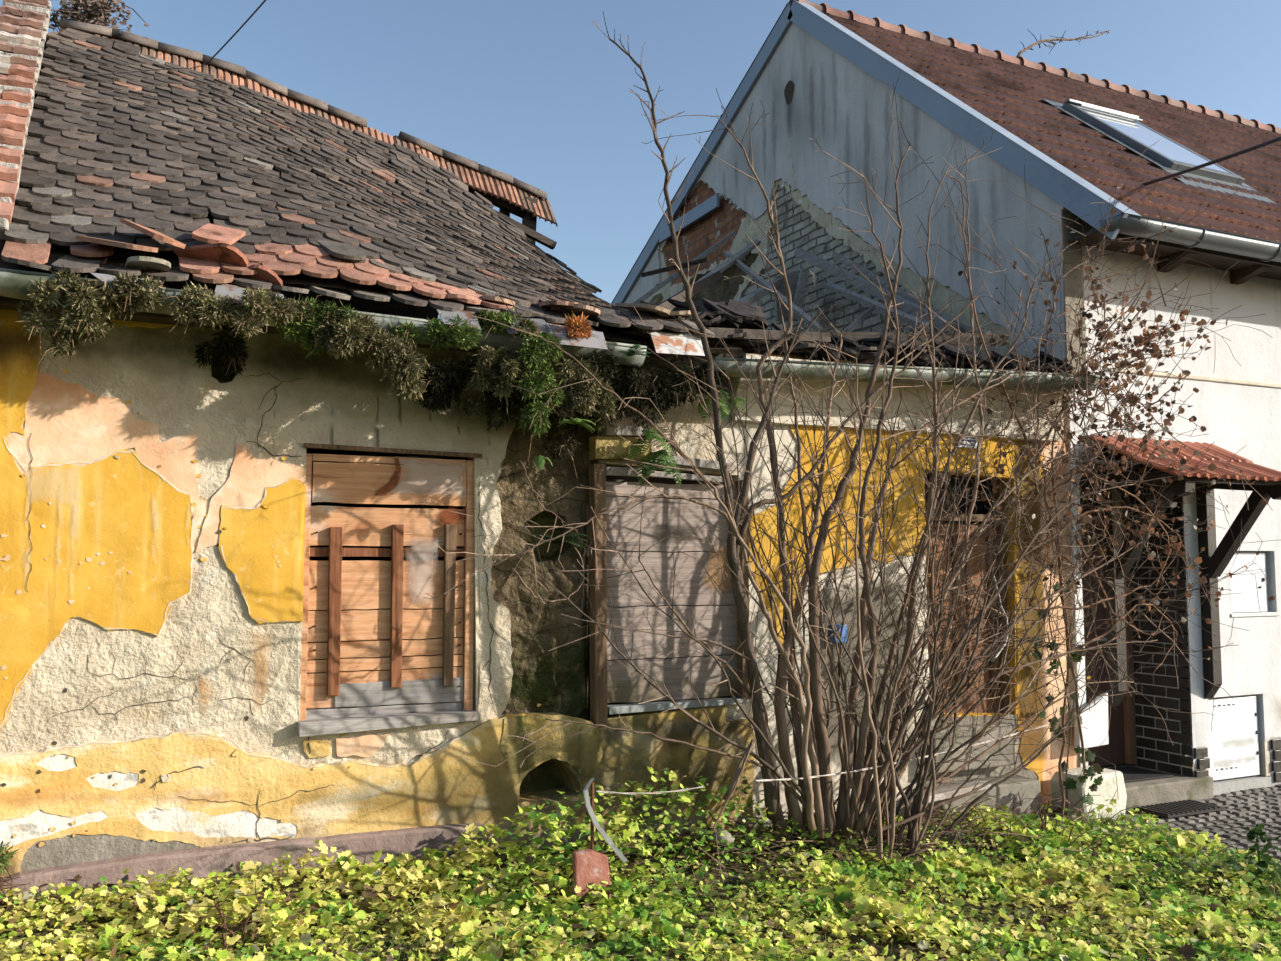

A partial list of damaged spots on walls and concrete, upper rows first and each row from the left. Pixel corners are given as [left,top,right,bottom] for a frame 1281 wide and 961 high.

spalling [644,179,1015,359]
crack [247,373,303,465]
crack [51,635,274,723]
spalling [0,321,931,905]